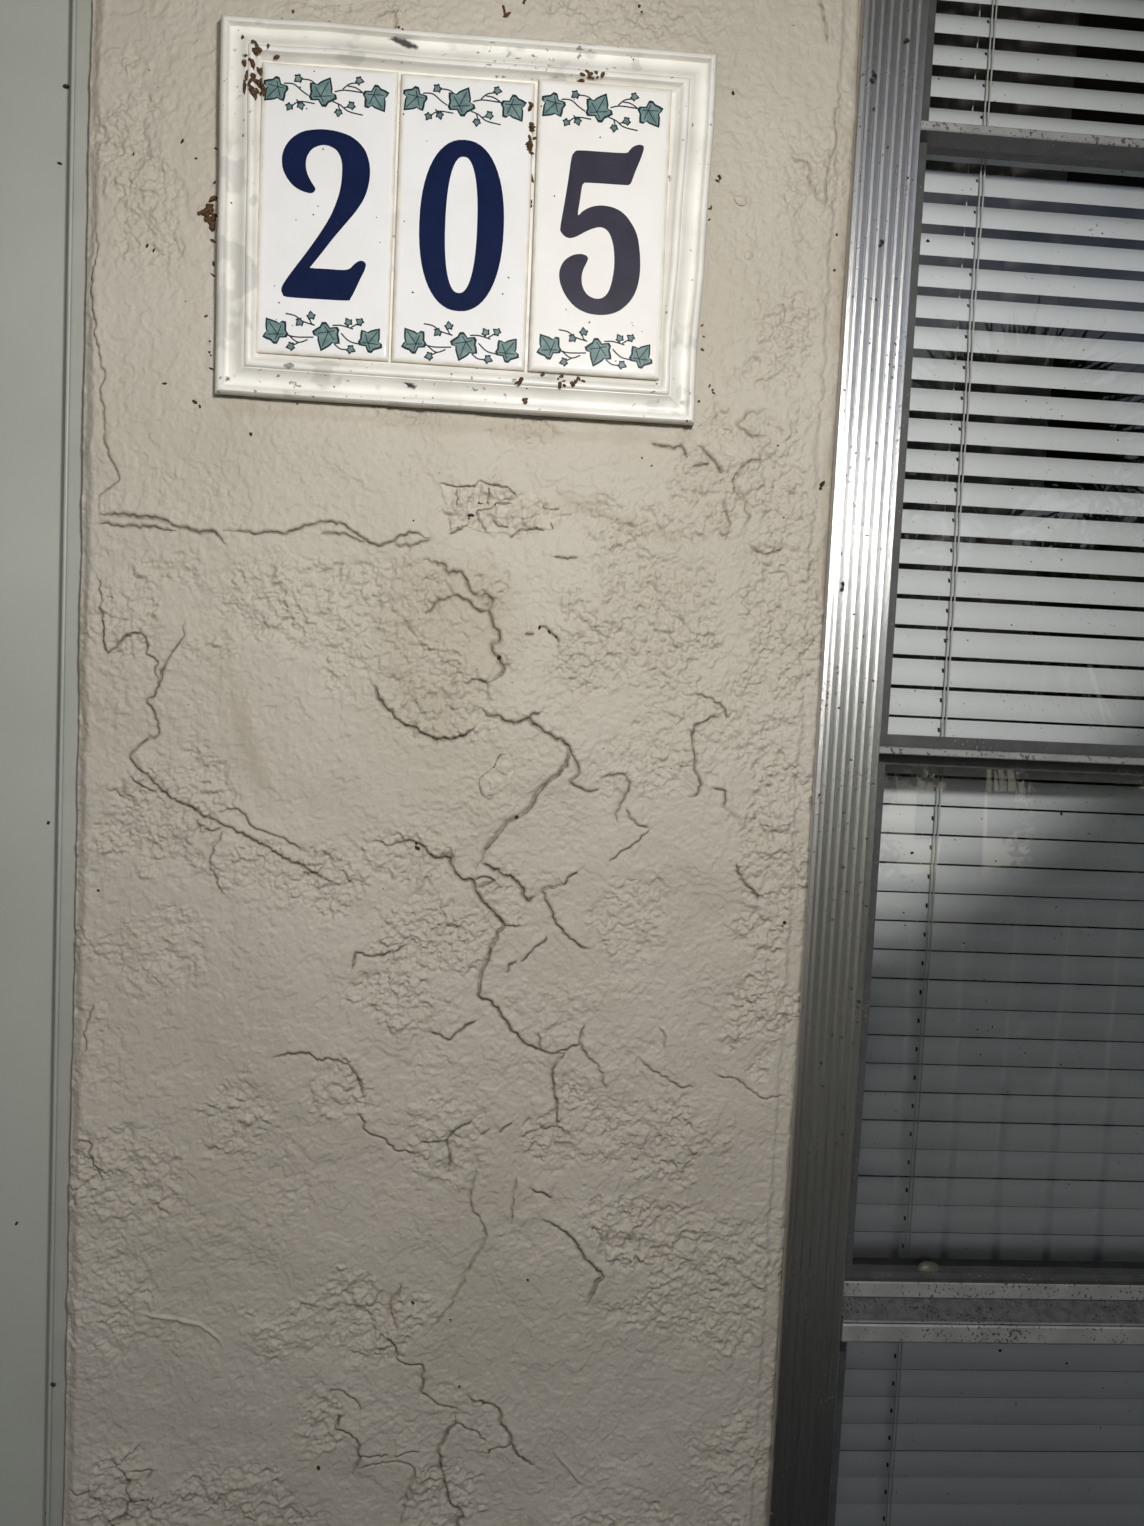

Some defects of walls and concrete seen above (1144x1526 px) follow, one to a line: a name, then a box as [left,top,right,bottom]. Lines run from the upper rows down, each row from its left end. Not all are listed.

crack [651,408,785,555]
crack [689,694,727,808]
crack [90,227,650,1526]
crack [736,863,759,901]
crack [80,1004,94,1057]
crack [640,1028,780,1100]
crack [78,1140,103,1181]
crack [69,1460,154,1526]